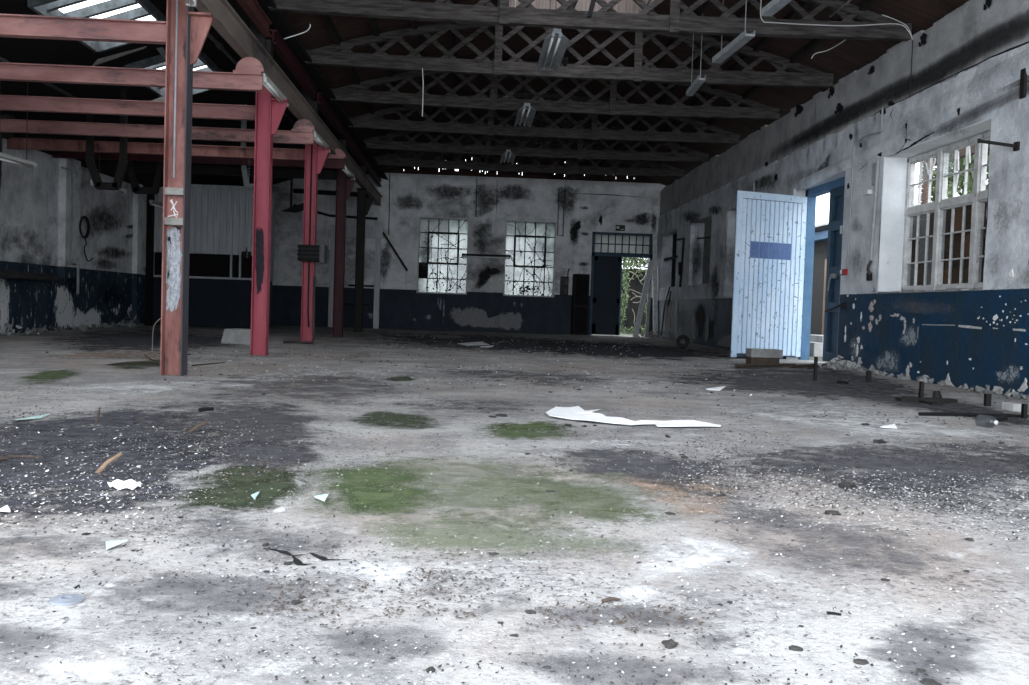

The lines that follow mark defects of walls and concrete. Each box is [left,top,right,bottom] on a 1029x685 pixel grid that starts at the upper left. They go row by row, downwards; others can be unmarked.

leakage [397,196,422,208]
leakage [431,185,528,214]
leakage [556,187,589,235]
leakage [97,225,133,269]
leakage [421,232,430,268]
peeling [0,278,10,331]
peeling [844,295,915,365]
spalling [986,366,1028,395]